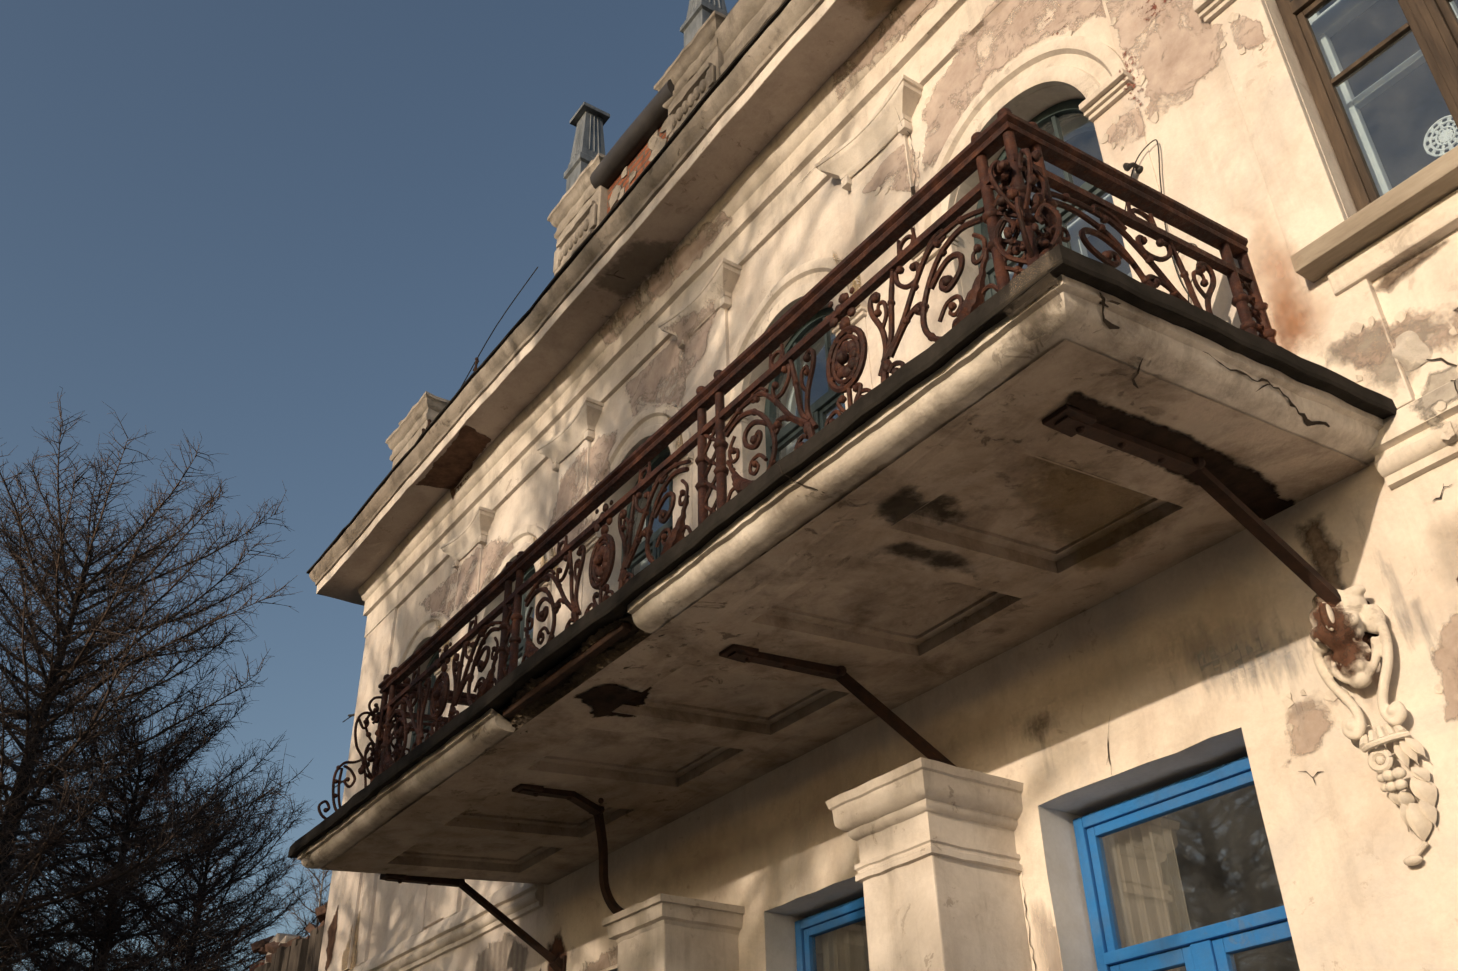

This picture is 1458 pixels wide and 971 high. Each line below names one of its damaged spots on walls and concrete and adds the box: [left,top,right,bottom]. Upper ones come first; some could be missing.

peeling [833,0,937,100]
peeling [862,0,1266,196]
peeling [598,209,732,344]
crack [1203,351,1330,427]
spalling [1332,309,1458,440]
leakage [879,488,963,524]
leakage [887,543,964,568]
spalling [1067,393,1295,520]
spalling [500,614,664,734]
rust [1310,596,1369,675]
peeling [1431,604,1458,721]
peeling [476,933,541,971]